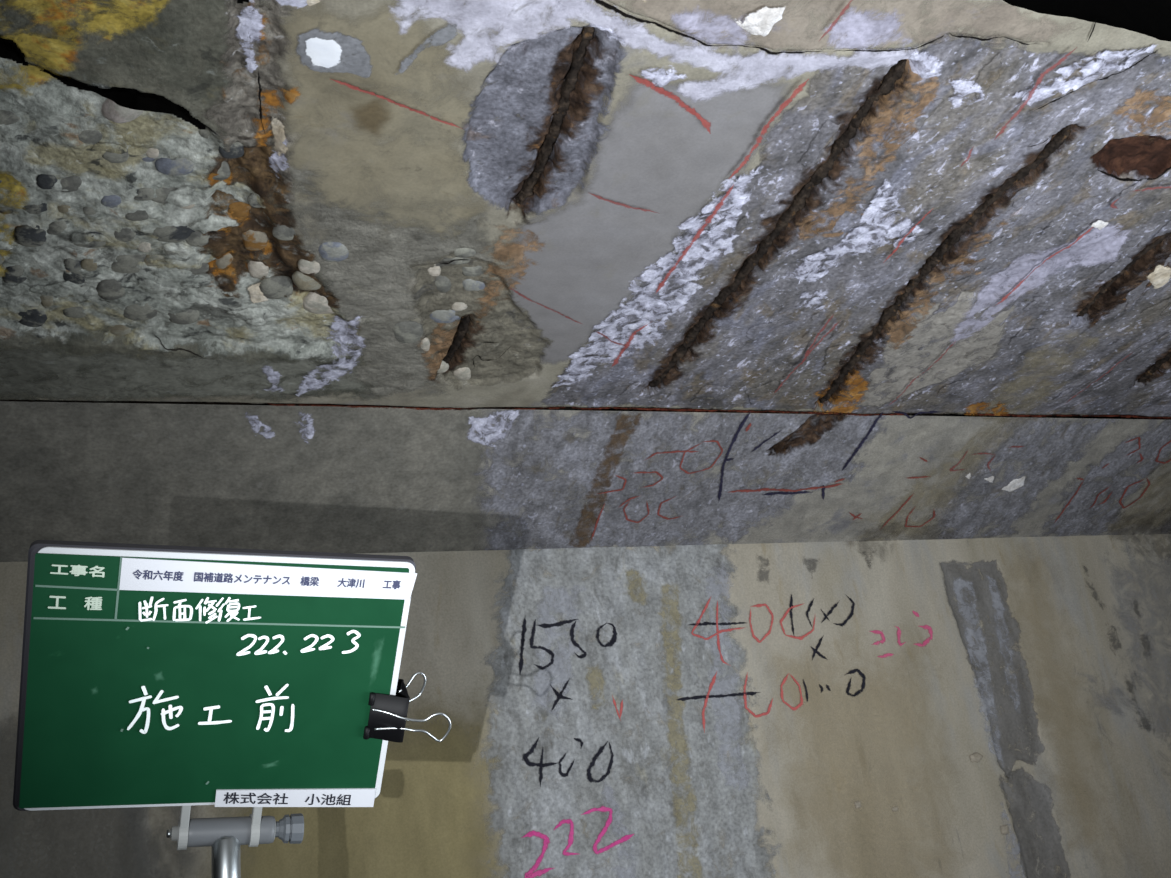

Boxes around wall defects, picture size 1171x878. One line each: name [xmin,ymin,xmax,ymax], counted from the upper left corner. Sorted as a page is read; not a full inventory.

crack [0,36,220,137]
spalling [0,0,359,362]
crack [257,71,265,133]
corrosion [198,88,349,314]
spalling [393,247,552,389]
corrosion [421,26,604,381]
damp [0,0,1070,401]
spalling [462,26,626,215]
corrosion [647,59,939,388]
corrosion [514,124,1086,547]
crack [595,0,1036,55]
peeling [542,33,1171,417]